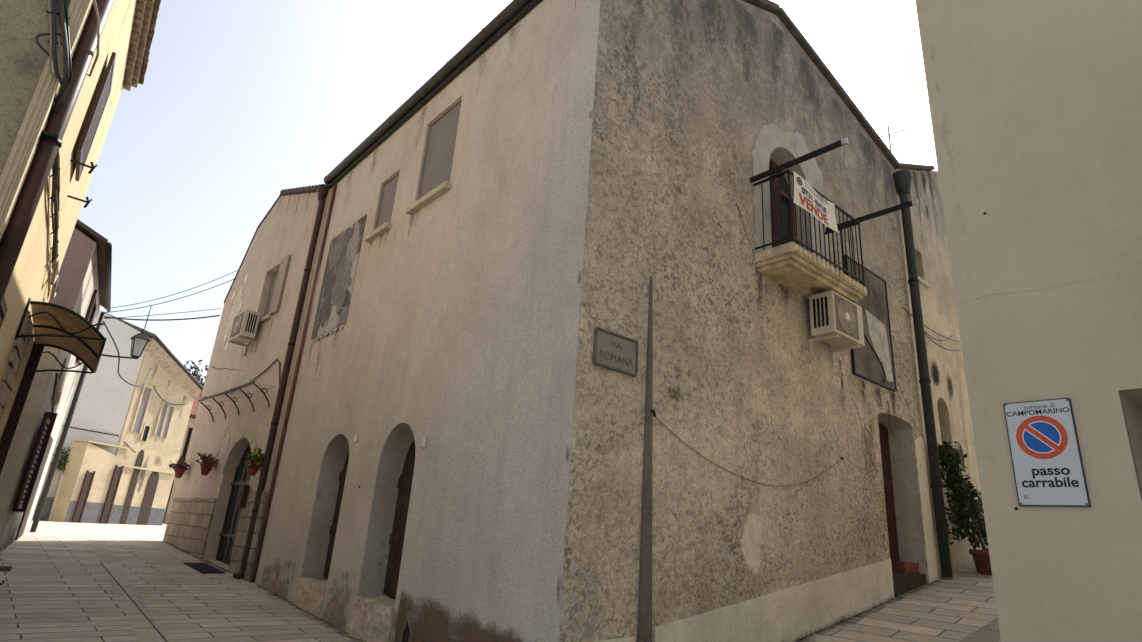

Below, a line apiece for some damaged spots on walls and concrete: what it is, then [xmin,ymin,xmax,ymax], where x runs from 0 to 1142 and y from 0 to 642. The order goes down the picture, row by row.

water stain [394,592,521,642]